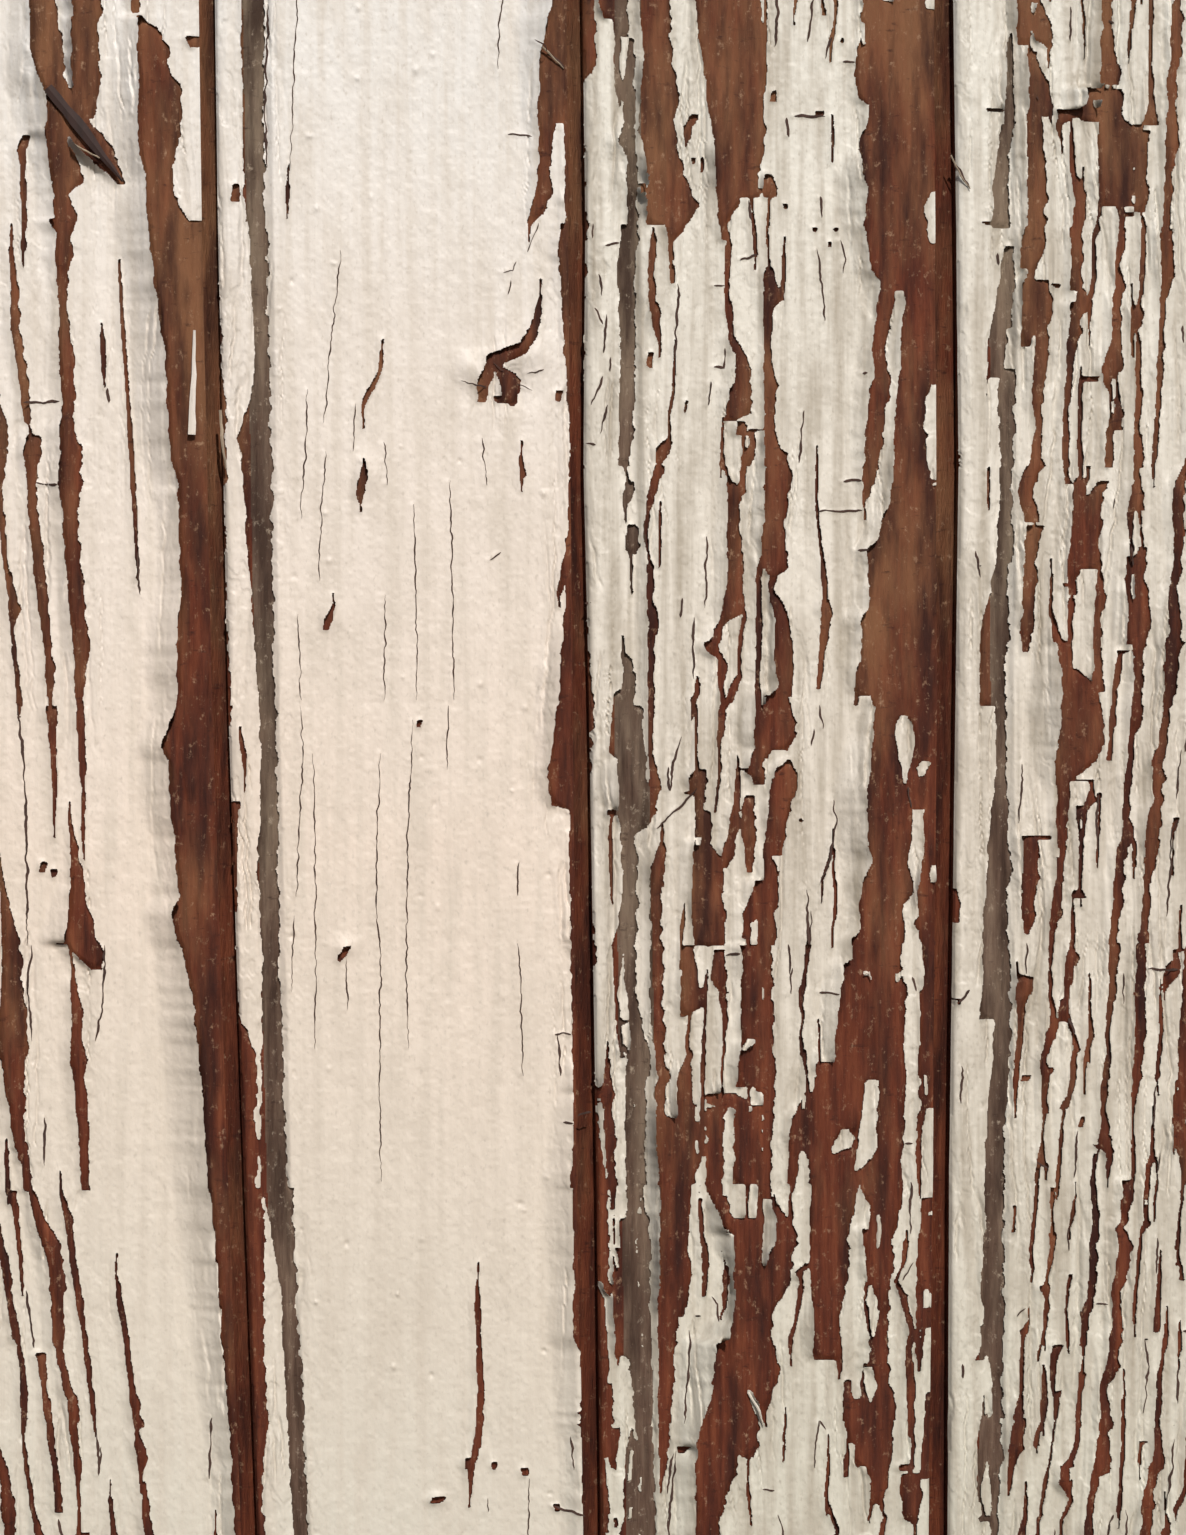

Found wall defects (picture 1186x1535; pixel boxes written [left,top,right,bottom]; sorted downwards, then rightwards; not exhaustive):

peeling [0,0,309,1535]
peeling [473,0,961,1535]
peeling [975,0,1186,1535]